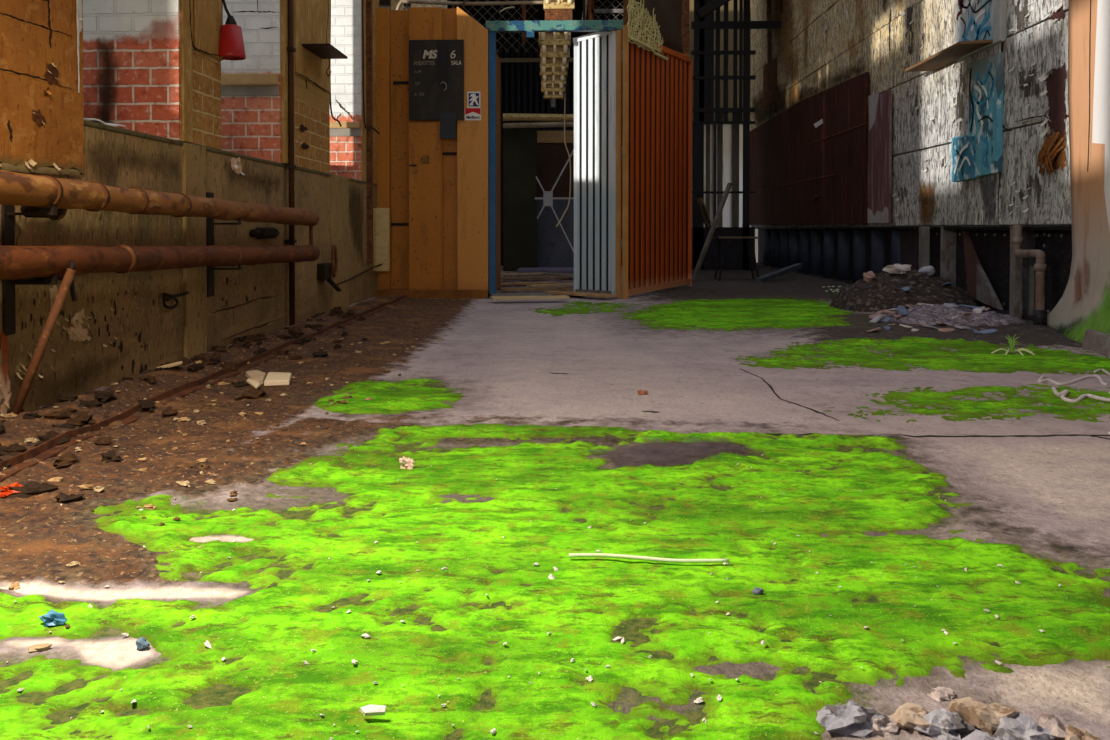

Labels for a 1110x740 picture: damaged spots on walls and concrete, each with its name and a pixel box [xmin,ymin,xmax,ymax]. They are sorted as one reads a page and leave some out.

crack [0,0,72,48]
peeling [901,6,925,61]
peeling [1009,0,1065,34]
crack [0,68,73,91]
peeling [951,61,967,131]
spalling [1009,61,1066,138]
rust [749,72,869,225]
peeling [1008,173,1049,215]
peeling [0,285,155,416]
crack [741,369,843,436]
crack [884,433,1110,441]